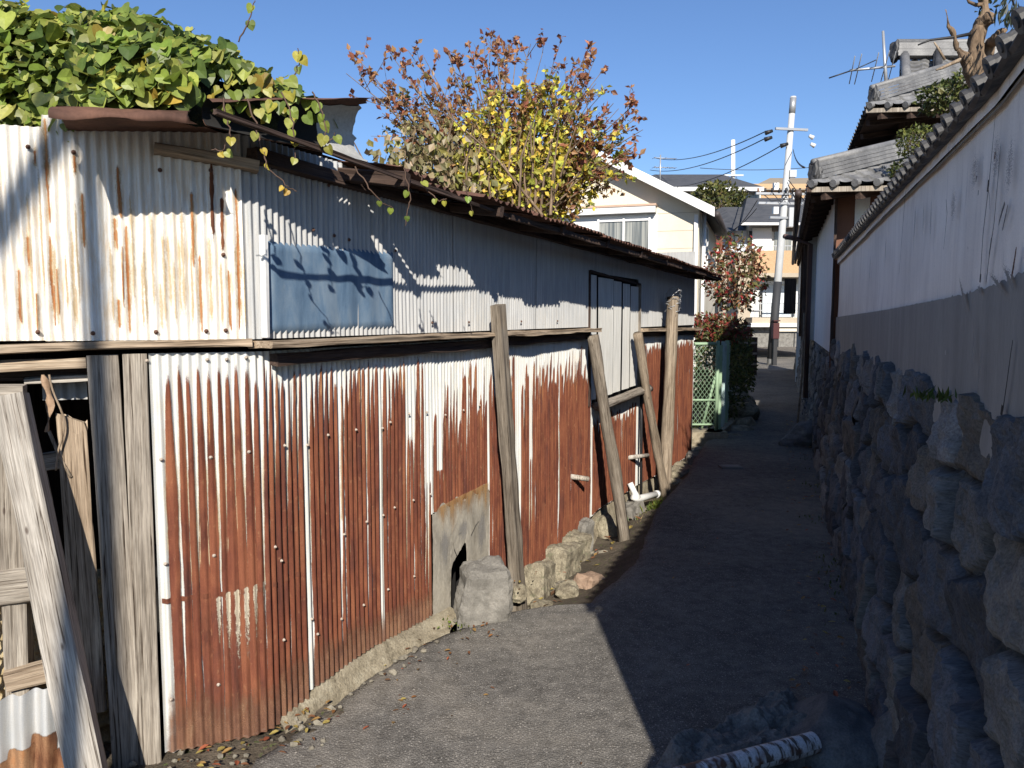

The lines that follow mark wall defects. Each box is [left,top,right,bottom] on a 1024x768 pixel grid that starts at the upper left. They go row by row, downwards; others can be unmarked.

corrosion [18,119,86,330]
corrosion [109,164,246,330]
corrosion [165,360,508,753]
corrosion [509,339,693,567]
corrosion [0,731,64,768]